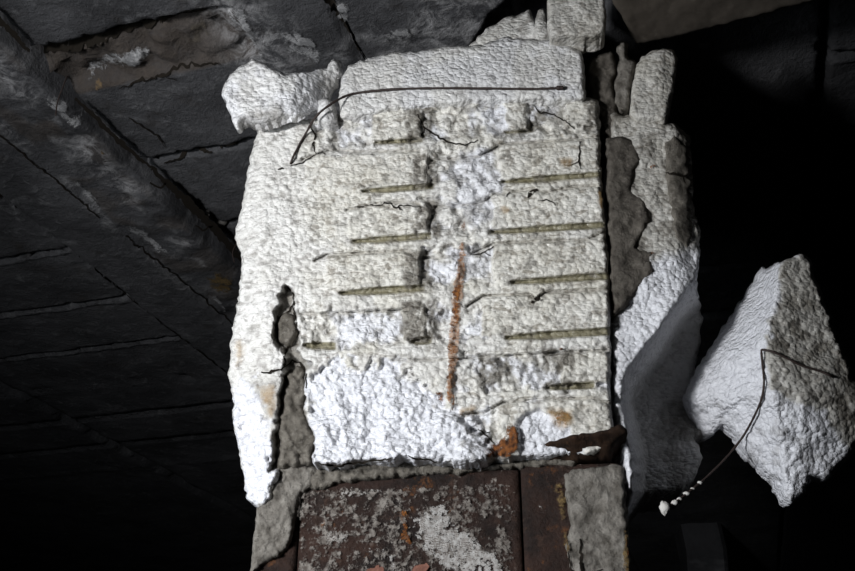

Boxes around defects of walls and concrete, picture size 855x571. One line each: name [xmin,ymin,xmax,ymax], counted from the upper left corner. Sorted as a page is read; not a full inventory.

spalling [89,49,148,75]
crack [74,97,256,263]
rust [436,242,466,410]
rust [485,425,519,458]